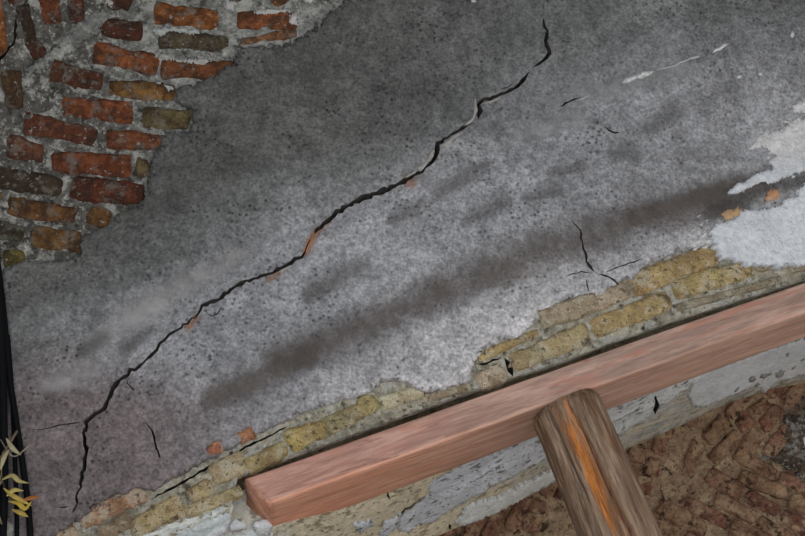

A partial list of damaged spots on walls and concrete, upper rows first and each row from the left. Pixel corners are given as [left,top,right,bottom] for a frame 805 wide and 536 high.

crack [0,0,28,61]
spalling [0,0,343,274]
crack [32,0,551,513]
spalling [57,100,805,536]
crack [567,220,641,291]
crack [387,492,421,517]